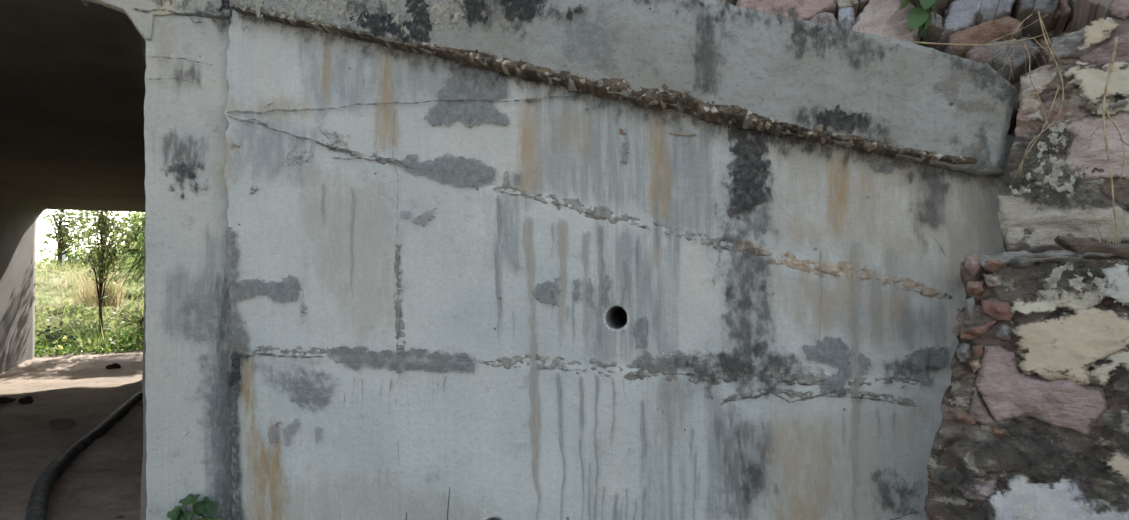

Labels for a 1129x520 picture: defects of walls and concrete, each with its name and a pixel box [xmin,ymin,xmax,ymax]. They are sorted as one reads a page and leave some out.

damp [197,0,560,70]
spalling [231,4,994,174]
damp [164,135,201,197]
crack [228,91,579,353]
damp [552,222,604,335]
damp [675,105,896,393]
damp [908,119,1103,228]
damp [216,282,243,520]
peeling [326,345,477,374]
damp [523,219,540,518]
damp [579,379,646,520]
peeling [752,337,871,395]